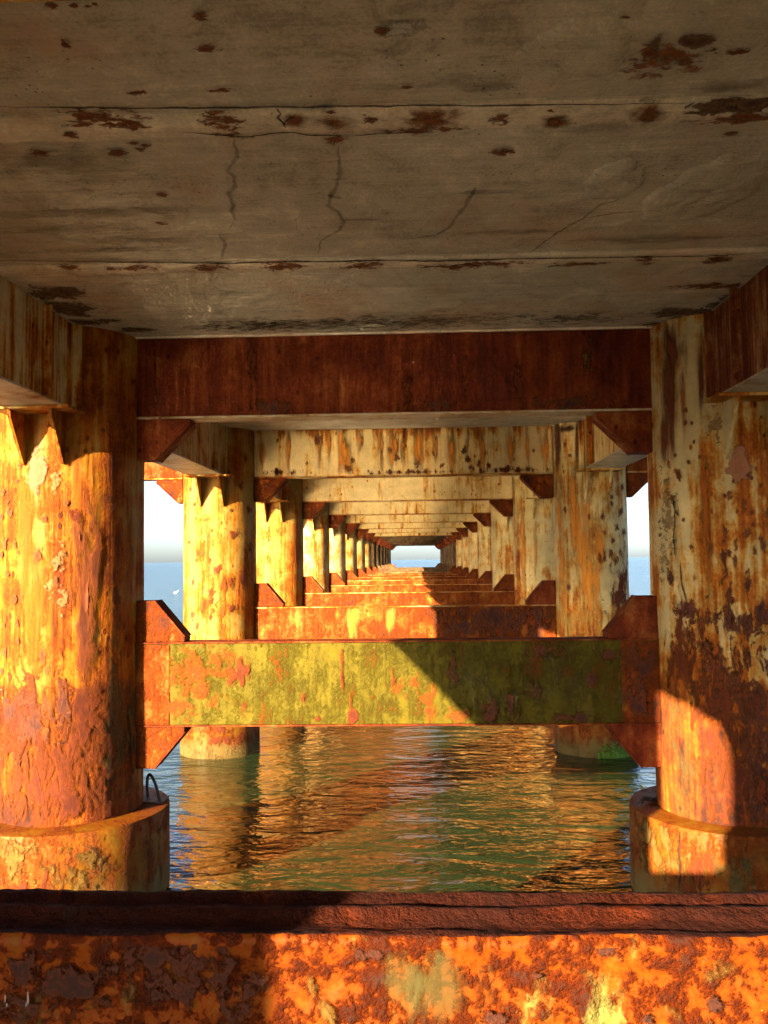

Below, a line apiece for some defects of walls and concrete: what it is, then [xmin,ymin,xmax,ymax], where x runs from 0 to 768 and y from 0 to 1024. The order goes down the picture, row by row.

rust [56,108,152,156]
rust [198,110,254,139]
rust [237,345,292,414]
rust [660,323,685,460]
rust [259,430,364,476]
rust [415,474,629,638]
rust [0,449,137,825]
rust [666,459,768,826]
rust [161,648,250,722]
rust [390,668,470,723]
rust [0,875,27,889]
rust [0,944,269,1024]